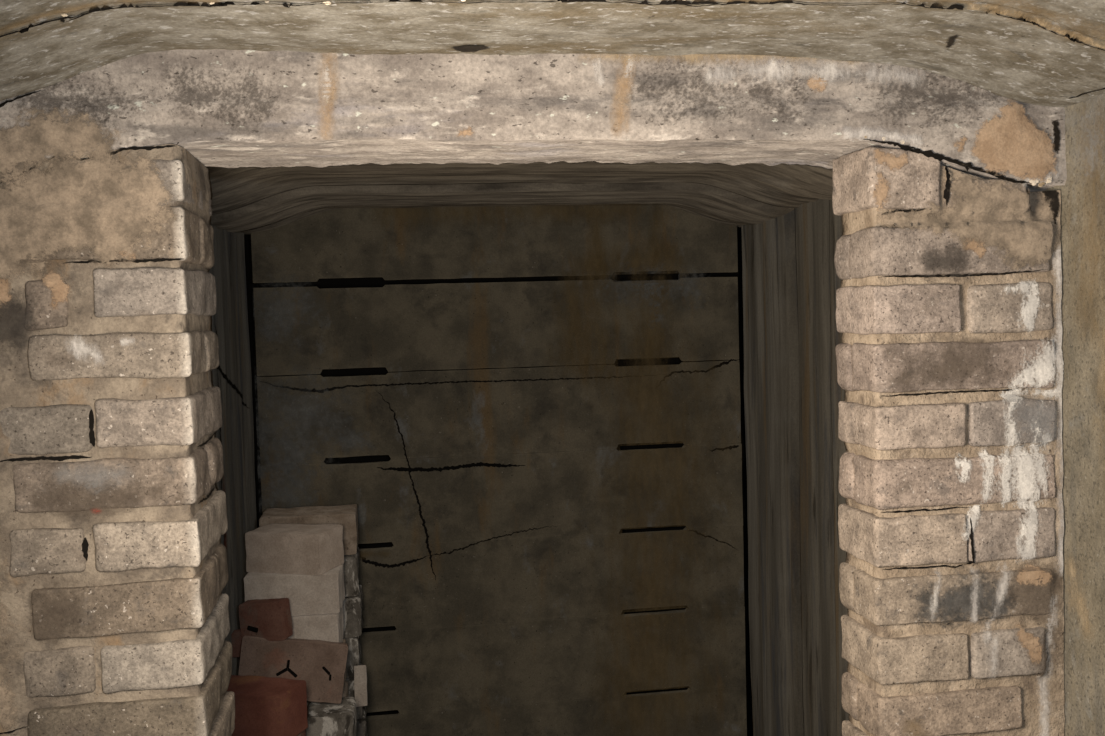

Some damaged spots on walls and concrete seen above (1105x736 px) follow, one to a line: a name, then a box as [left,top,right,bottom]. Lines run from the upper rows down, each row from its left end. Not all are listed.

crack [0,0,1105,51]
crack [0,91,39,108]
crack [864,139,1030,215]
flaking render [844,99,1061,270]
crack [0,409,95,462]
crack [217,359,739,580]
water stain [955,249,1073,736]
crack [81,537,89,561]
crack [882,507,975,570]